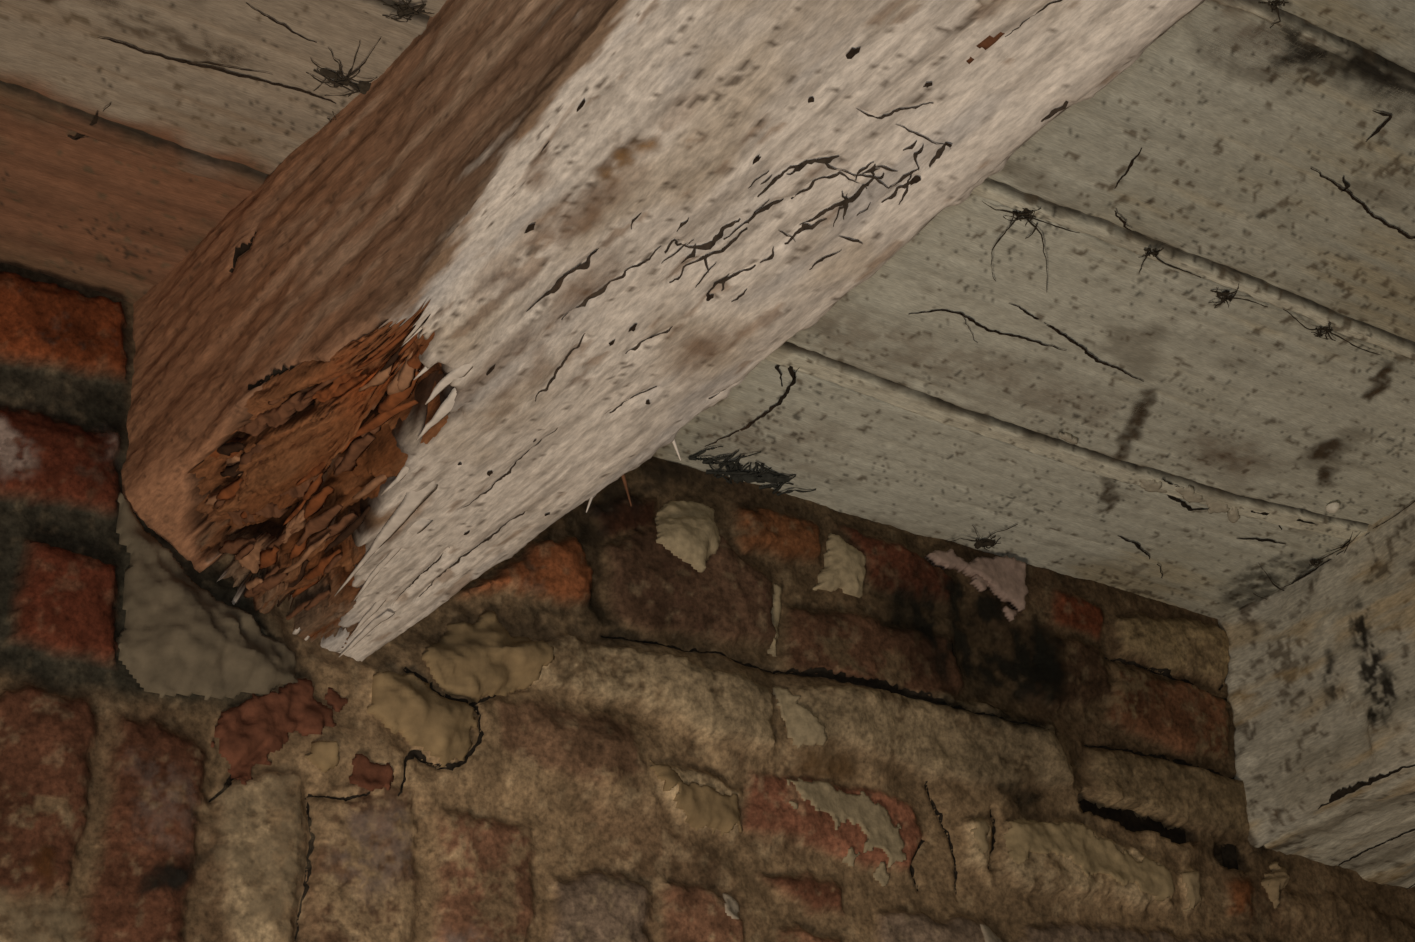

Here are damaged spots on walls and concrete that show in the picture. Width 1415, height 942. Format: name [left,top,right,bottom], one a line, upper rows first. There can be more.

crack [526,102,946,402]
efflorescence [0,418,32,471]
crack [461,428,558,509]
crack [610,386,657,413]
crack [705,365,800,447]
crack [394,511,525,603]
peeling [924,549,1029,622]
peeling [772,686,827,749]
crack [601,636,1036,727]
leakage [893,579,1062,702]
crack [295,667,496,940]
peeling [786,777,907,887]